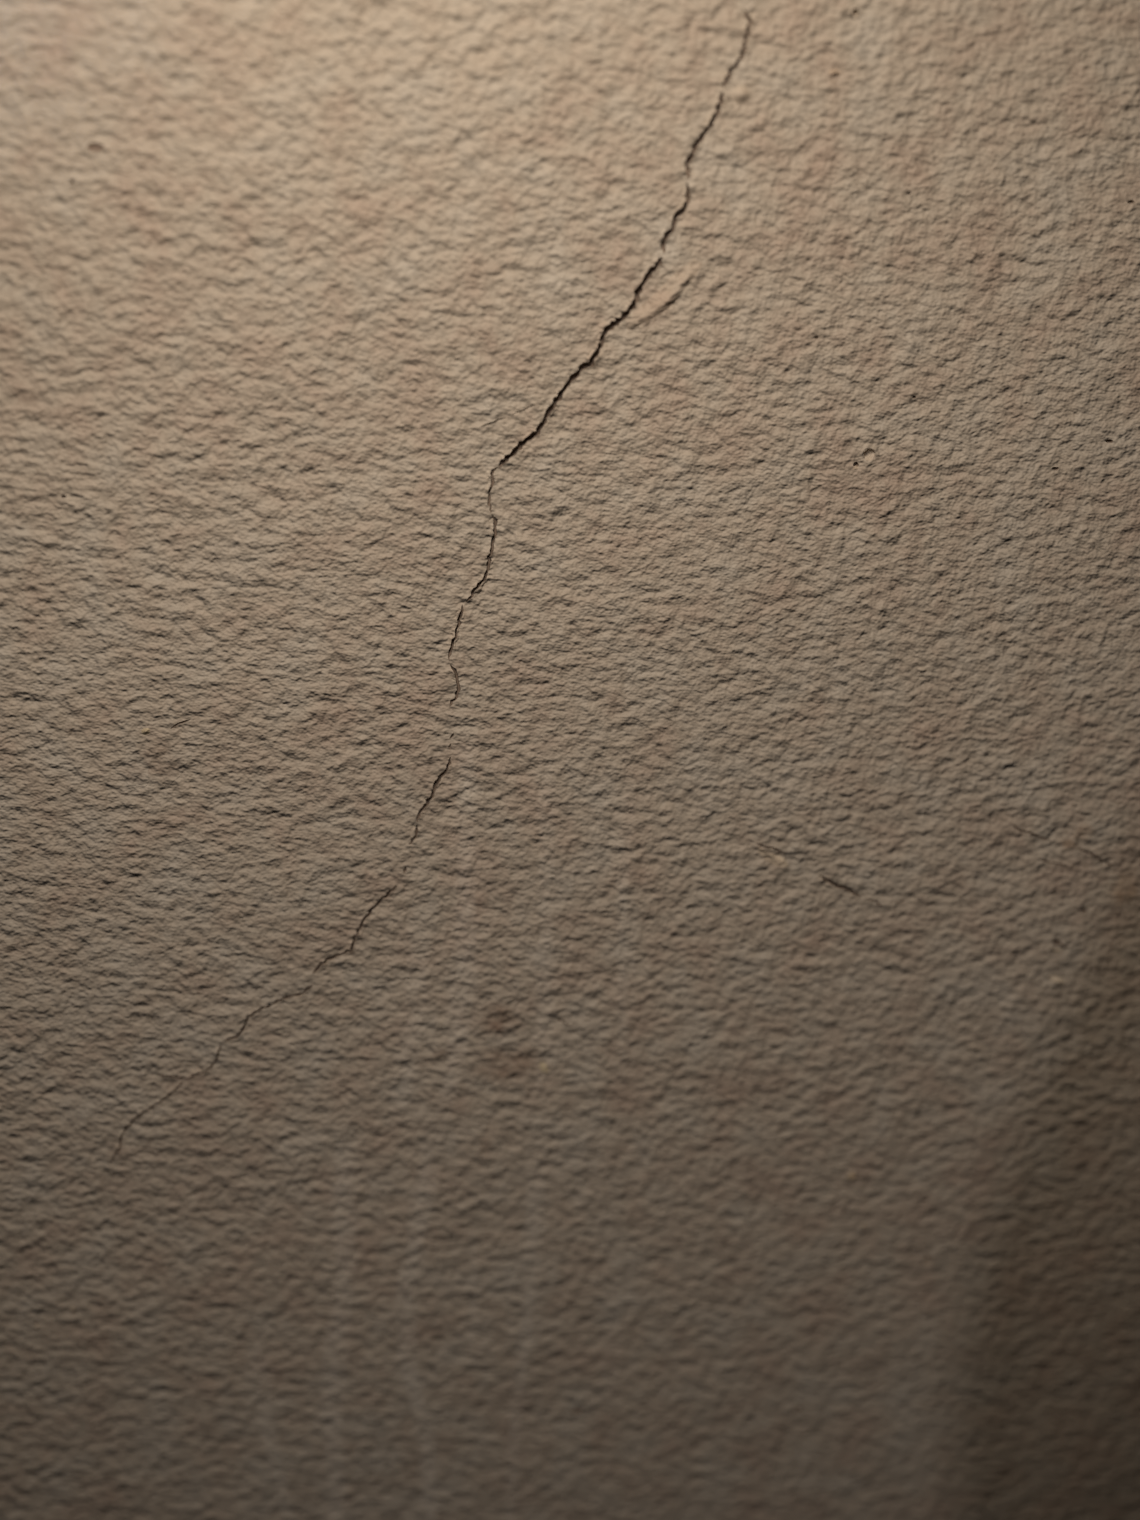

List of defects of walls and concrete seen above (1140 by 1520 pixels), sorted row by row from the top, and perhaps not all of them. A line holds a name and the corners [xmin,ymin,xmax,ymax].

crack [109,0,756,1165]